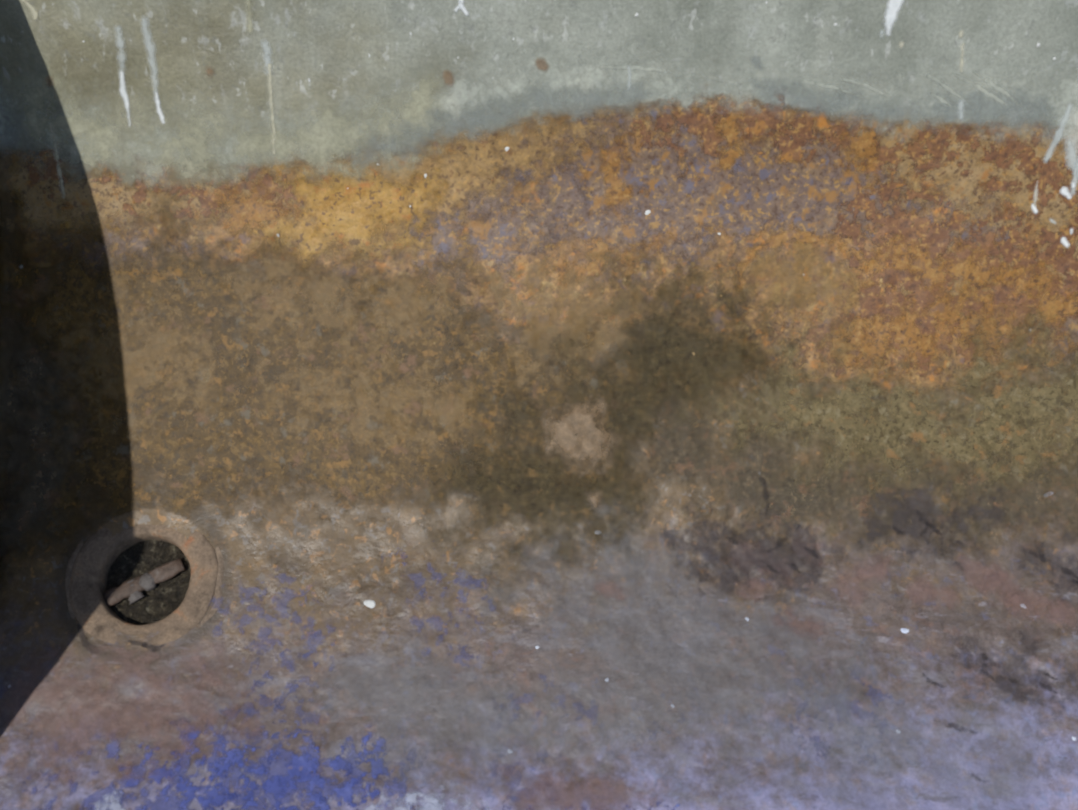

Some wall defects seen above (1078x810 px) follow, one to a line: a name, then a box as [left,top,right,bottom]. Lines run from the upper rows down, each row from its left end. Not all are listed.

water stain [0,19,709,194]
water stain [915,32,1078,199]
corrosion [0,92,1078,554]
peeling [33,721,442,810]